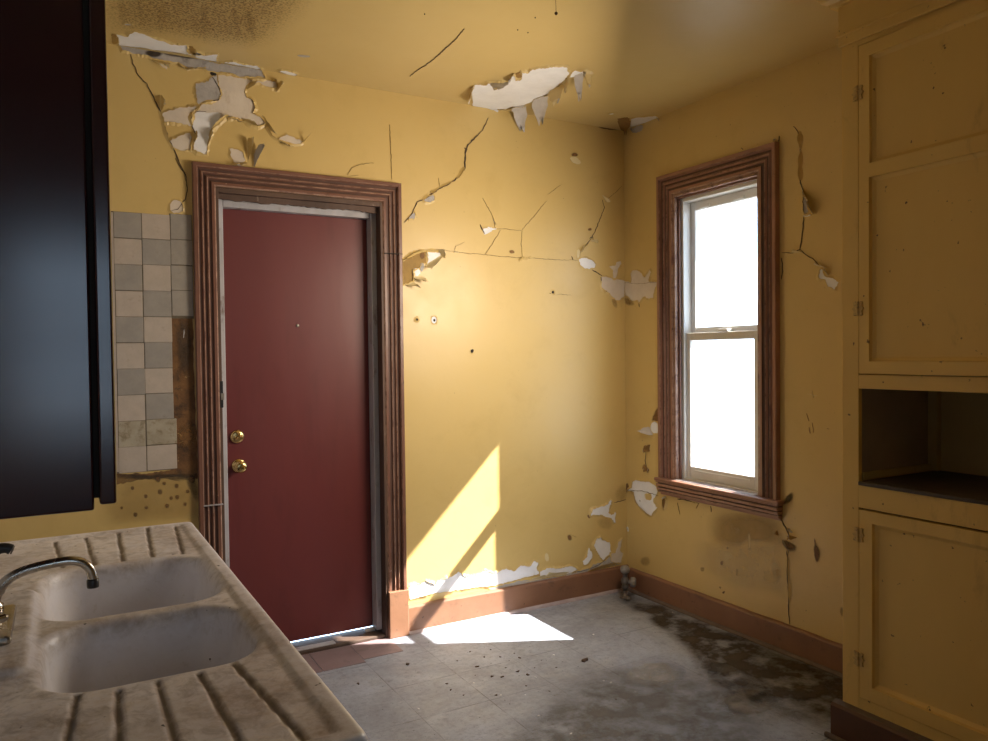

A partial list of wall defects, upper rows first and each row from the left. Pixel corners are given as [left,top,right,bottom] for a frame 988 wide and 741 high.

crack [130,54,188,214]
peeling [111,21,311,167]
crack [410,29,464,76]
crack [405,118,488,222]
peeling [468,65,594,132]
peeling [600,112,661,135]
peeling [402,248,446,288]
crack [446,186,622,276]
peeling [599,259,657,304]
peeling [407,477,712,601]
crack [781,520,792,624]